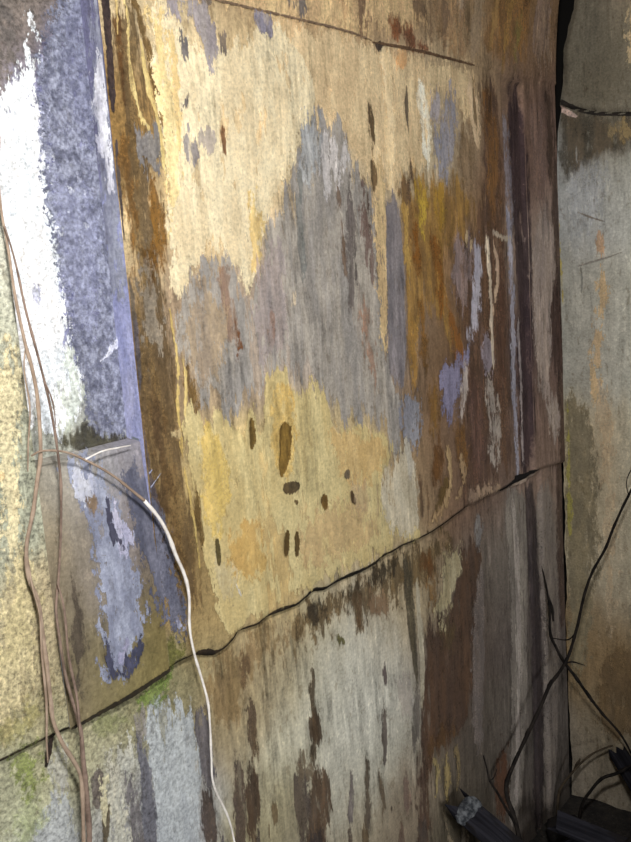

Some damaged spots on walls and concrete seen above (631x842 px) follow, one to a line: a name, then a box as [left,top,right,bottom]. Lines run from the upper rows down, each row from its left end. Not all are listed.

crack [216,0,475,66]
corrosion [388,0,450,52]
crack [560,99,631,117]
corrosion [112,0,207,612]
crack [498,469,539,491]
crack [0,506,467,767]
water stain [403,553,425,751]
water stain [470,514,485,756]
water stain [293,669,333,842]
water stain [347,699,393,842]
water stain [455,796,482,826]